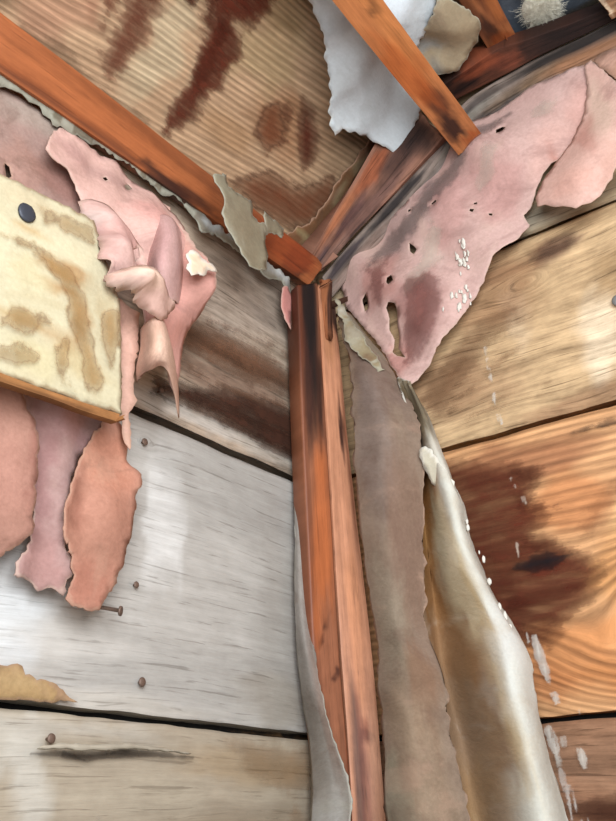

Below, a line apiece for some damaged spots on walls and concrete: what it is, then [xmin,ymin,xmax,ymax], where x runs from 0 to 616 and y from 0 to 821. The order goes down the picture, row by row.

water stain [109,0,158,69]
water stain [163,0,270,134]
water stain [301,110,314,163]
water stain [238,174,334,226]
peeling [455,237,470,276]
peeling [450,284,472,312]
water stain [449,466,594,643]
crack [35,750,186,761]